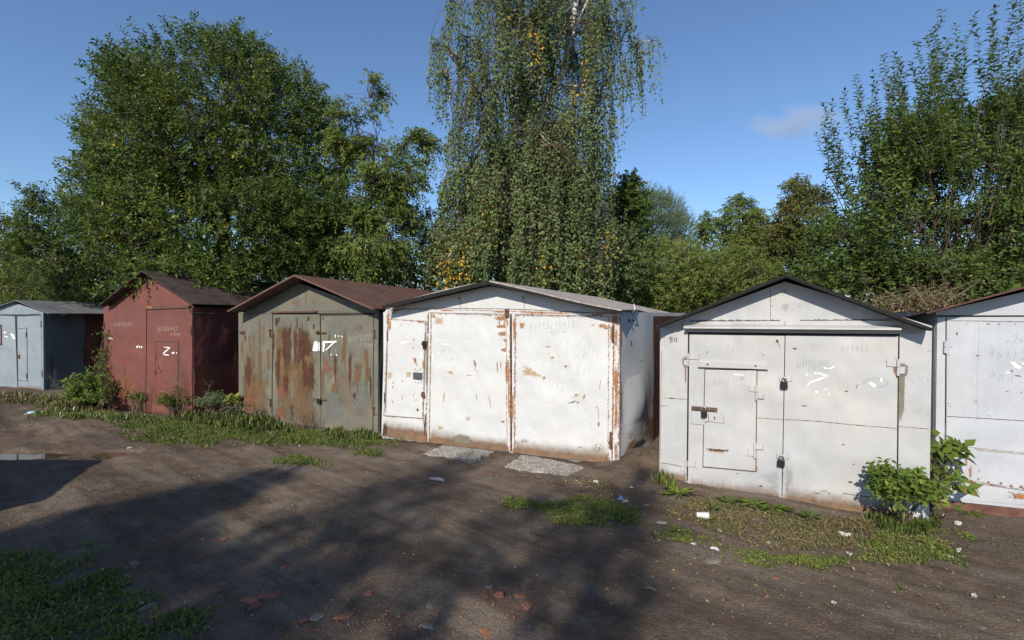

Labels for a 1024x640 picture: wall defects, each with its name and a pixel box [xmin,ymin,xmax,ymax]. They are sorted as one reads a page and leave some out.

rust [239,296,635,461]